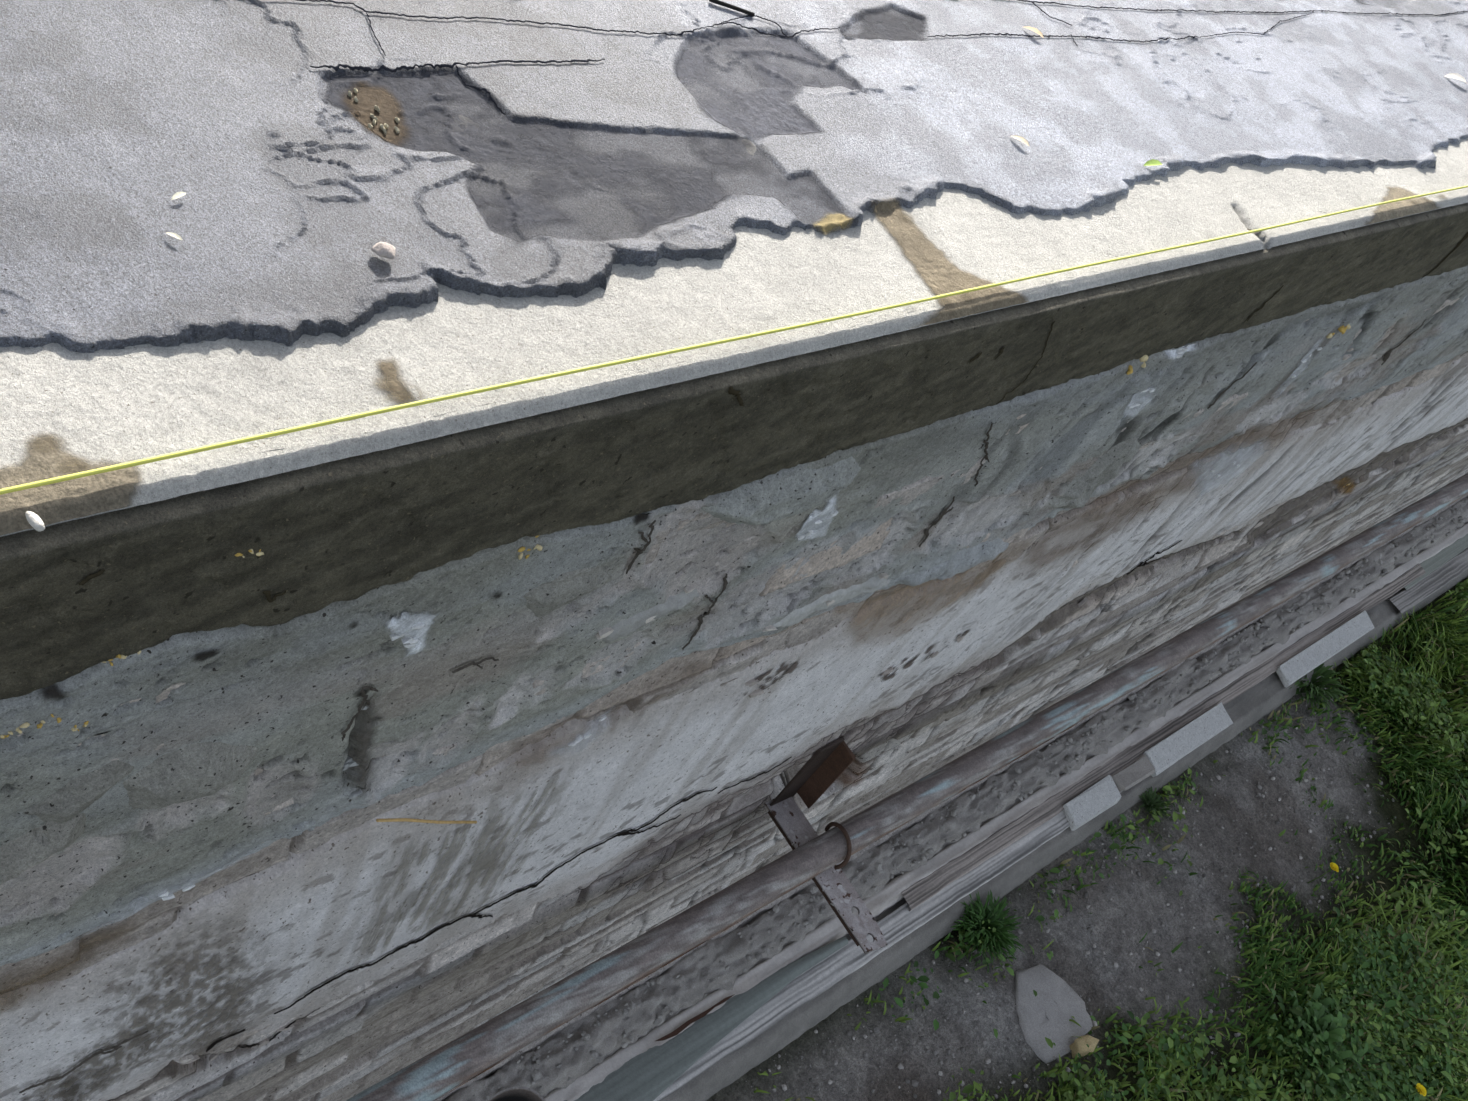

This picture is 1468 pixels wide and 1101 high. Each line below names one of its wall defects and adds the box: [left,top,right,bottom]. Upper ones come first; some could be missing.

peeling [348,88,400,135]
crack [296,0,840,115]
crack [928,0,1468,46]
leakage [875,199,1028,327]
leakage [0,435,140,536]
crack [206,756,792,1052]